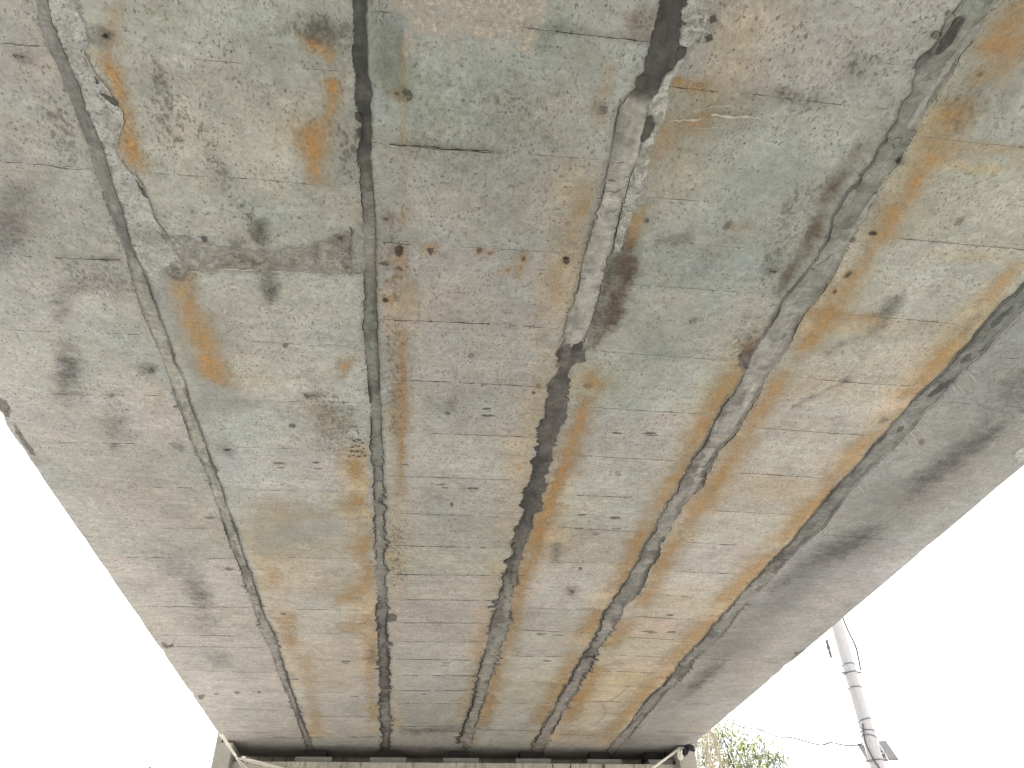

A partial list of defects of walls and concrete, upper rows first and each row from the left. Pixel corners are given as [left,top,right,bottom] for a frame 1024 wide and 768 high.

crack [0,162,91,173]
crack [512,26,651,42]
spalling [614,0,718,253]
crack [909,41,973,103]
crack [25,191,313,748]
crack [353,66,637,750]
crack [531,130,1024,768]